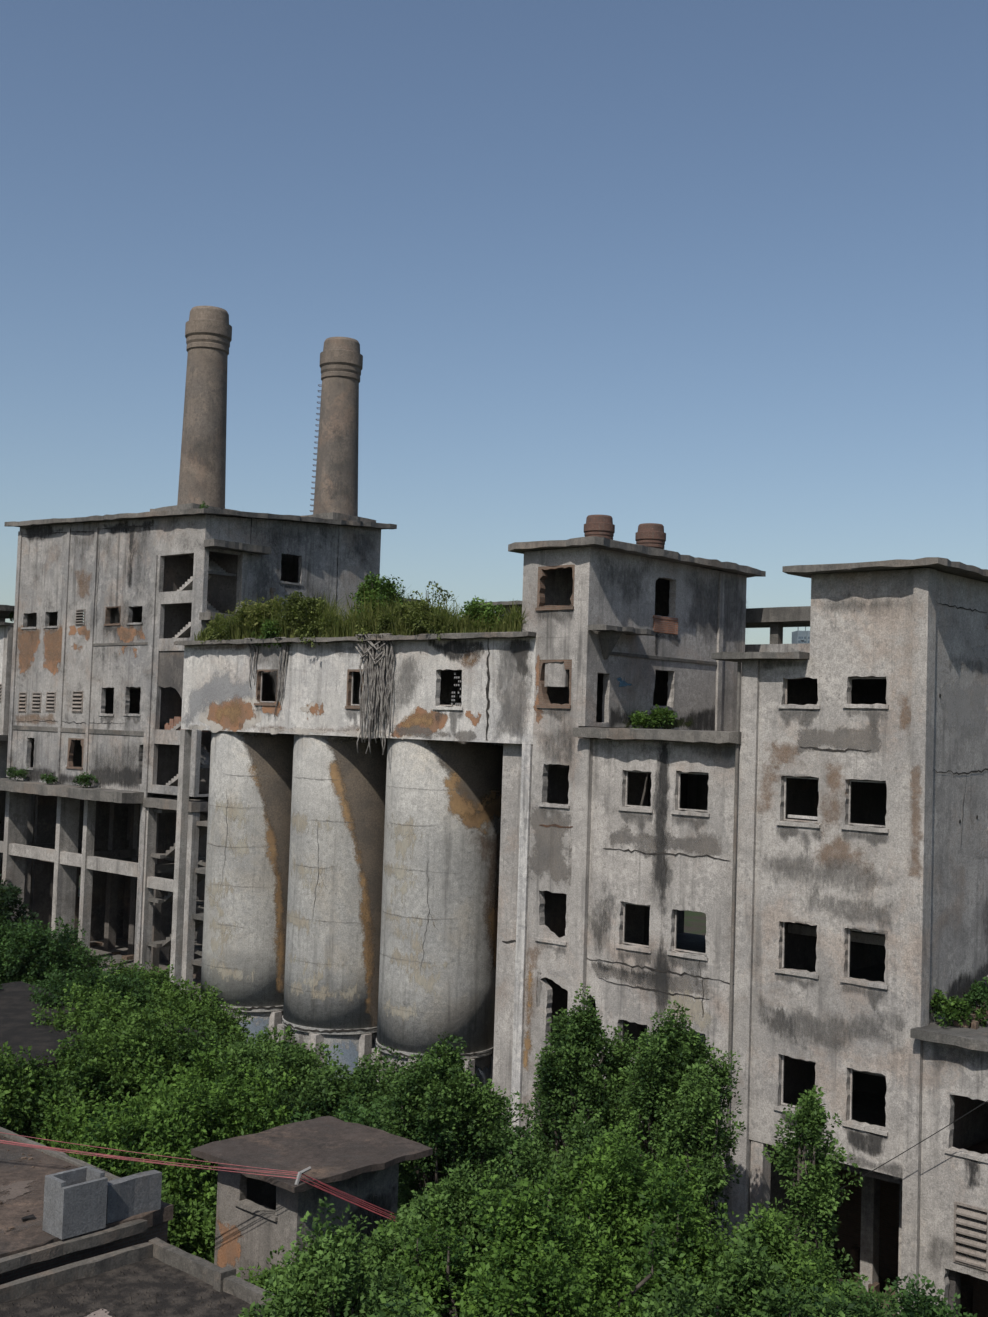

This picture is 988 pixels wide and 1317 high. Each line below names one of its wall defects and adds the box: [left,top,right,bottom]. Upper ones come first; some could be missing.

peeling [18,625,90,675]
peeling [189,696,481,743]
rust [249,765,285,993]
rust [330,762,375,1011]
rust [444,773,502,967]
damp [648,743,668,910]
damp [655,946,673,1013]